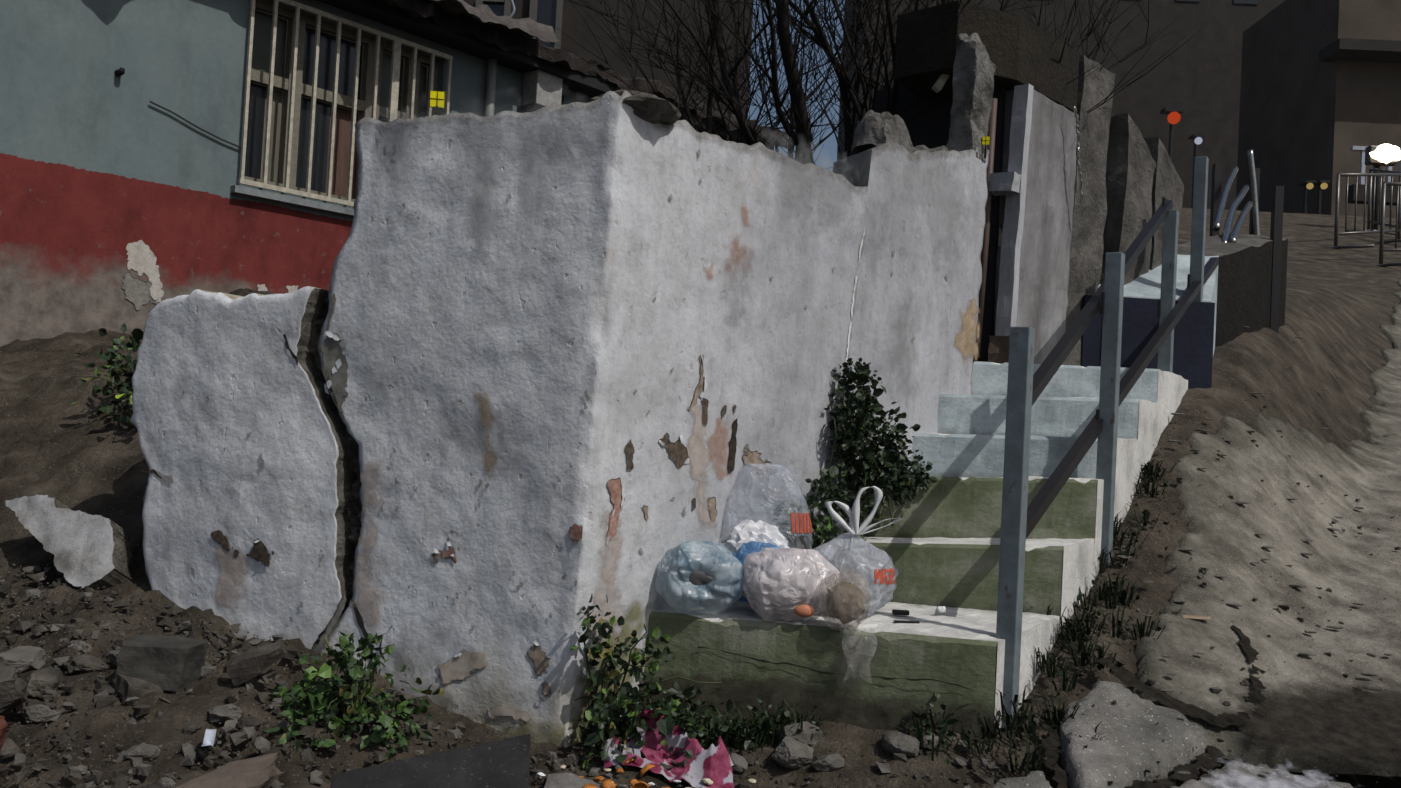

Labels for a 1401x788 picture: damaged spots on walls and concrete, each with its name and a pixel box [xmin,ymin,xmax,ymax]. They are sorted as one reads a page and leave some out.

peeling [122,240,164,310]
peeling [321,292,368,413]
crack [283,297,393,674]
peeling [607,439,635,544]
peeling [659,354,717,525]
spalling [742,444,775,474]
spalling [211,530,274,610]
spalling [431,538,460,563]
spalling [437,641,497,705]
spalling [527,641,552,702]
crack [1097,625,1266,788]
crack [1042,723,1069,788]